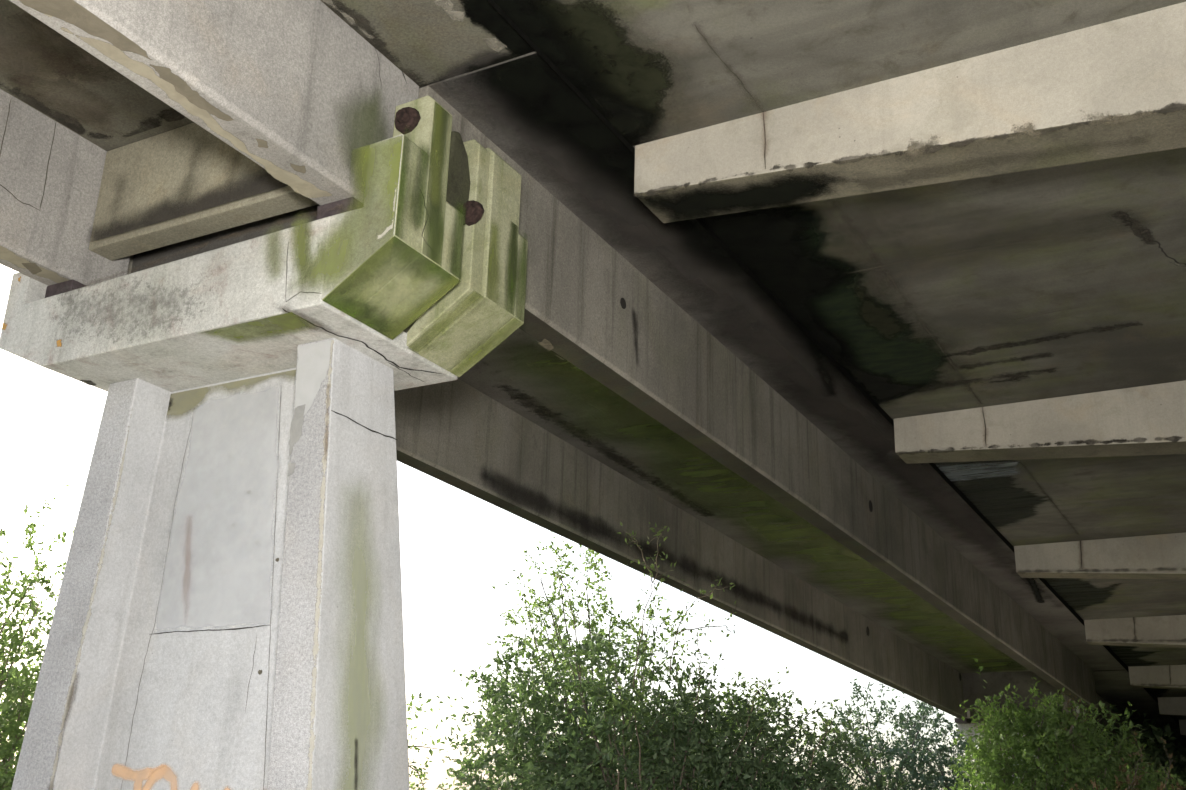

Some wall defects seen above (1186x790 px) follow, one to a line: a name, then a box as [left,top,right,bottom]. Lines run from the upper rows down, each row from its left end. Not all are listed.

water stain [0,84,184,139]
peeling [19,0,332,198]
crack [695,25,766,169]
spalling [770,103,1186,170]
spalling [634,178,717,197]
crack [1114,211,1186,268]
crack [282,241,442,383]
water stain [322,0,1142,611]
crack [331,410,397,440]
spalling [892,436,1182,456]
water stain [482,471,848,642]